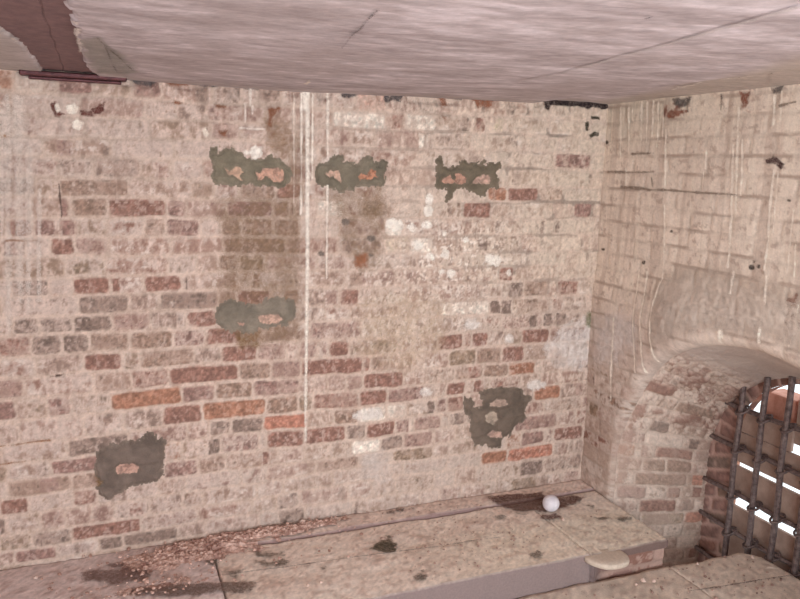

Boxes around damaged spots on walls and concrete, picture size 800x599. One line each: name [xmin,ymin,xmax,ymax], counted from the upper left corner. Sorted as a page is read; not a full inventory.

damp [619,100,667,185]
flaking render [256,168,284,183]
flaking render [442,173,490,185]
damp [321,185,449,279]
damp [717,106,744,343]
damp [763,169,779,304]
damp [485,254,511,276]
flaking render [258,314,282,325]
flaking render [485,399,508,438]
flaking render [116,463,139,474]